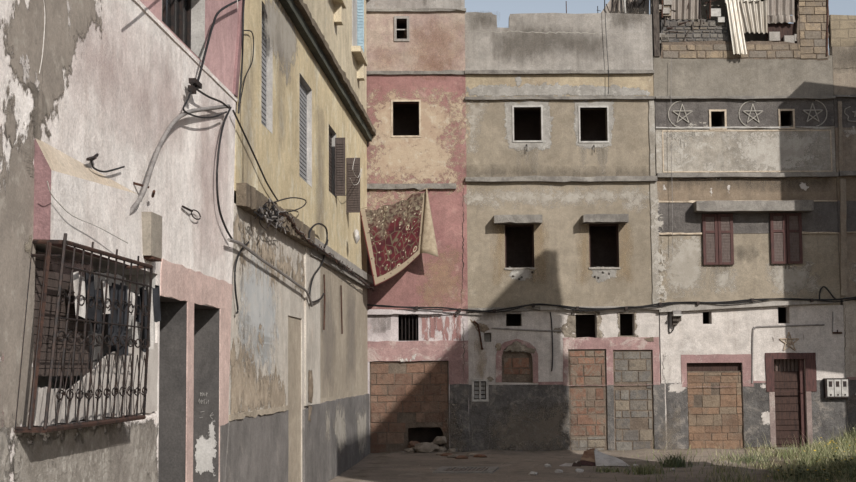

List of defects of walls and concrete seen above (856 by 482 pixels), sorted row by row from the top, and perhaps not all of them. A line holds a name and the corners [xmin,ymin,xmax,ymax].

peeling [195,421,217,476]